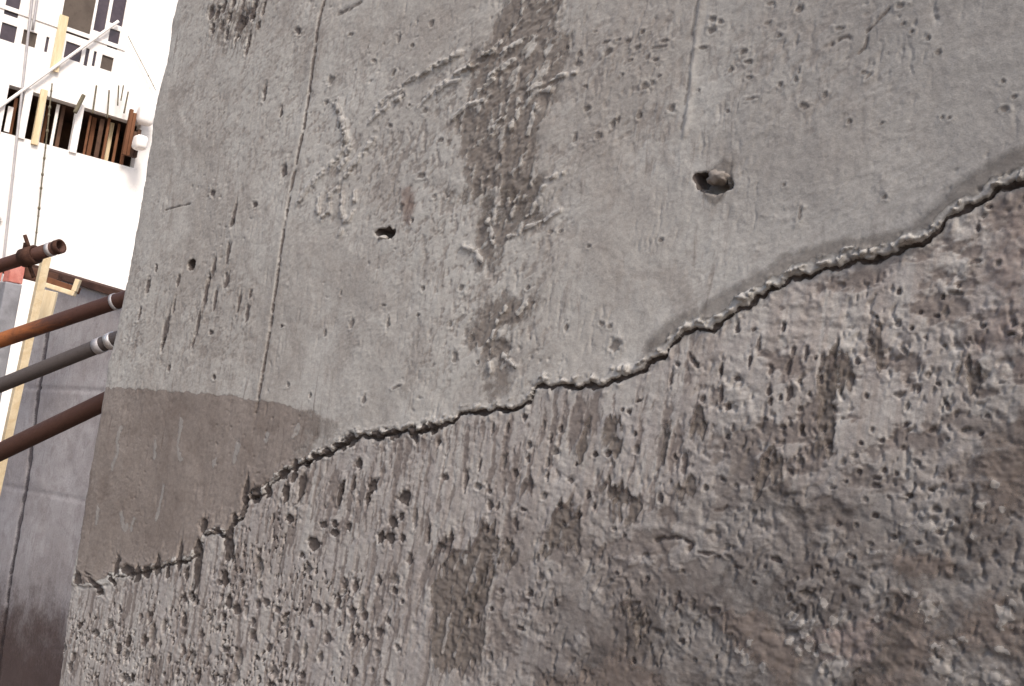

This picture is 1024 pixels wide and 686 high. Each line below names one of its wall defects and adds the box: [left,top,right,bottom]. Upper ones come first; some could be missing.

spalling [192,243,231,347]
peeling [467,286,537,397]
crack [74,170,1024,603]
spalling [503,442,642,580]
spalling [568,399,642,484]
spalling [661,419,708,501]
spalling [690,396,707,440]
spalling [735,324,761,381]
spalling [767,343,898,499]
spalling [867,316,907,373]
spalling [94,556,391,684]
spalling [427,460,526,675]